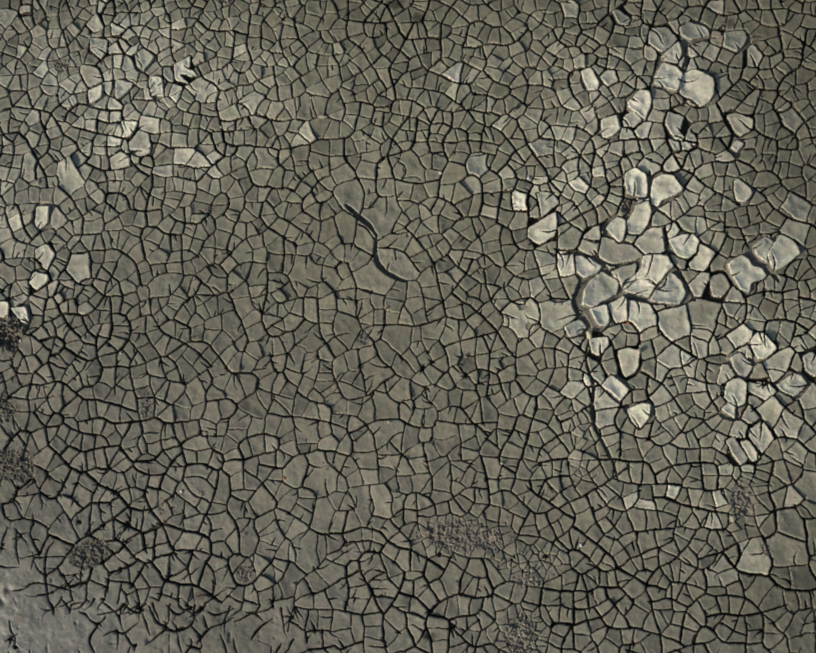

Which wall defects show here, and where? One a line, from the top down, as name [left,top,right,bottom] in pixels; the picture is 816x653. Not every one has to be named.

spalling [620,199,634,217]
crack [497,553,531,574]
crack [79,611,106,653]
crack [104,622,138,652]
crack [251,618,273,639]
crack [271,638,295,653]